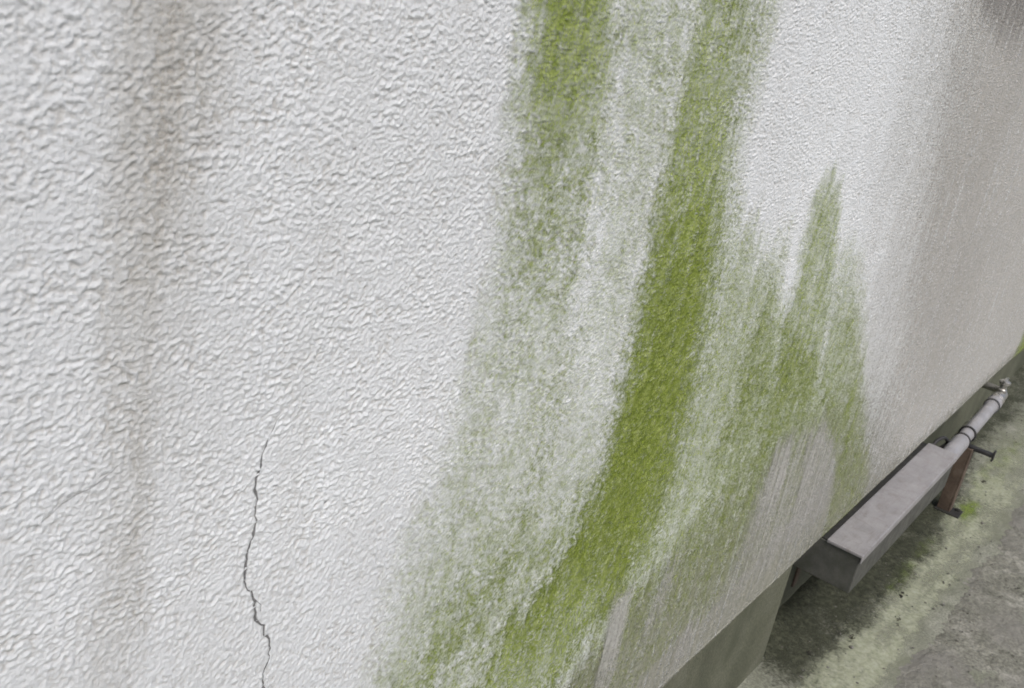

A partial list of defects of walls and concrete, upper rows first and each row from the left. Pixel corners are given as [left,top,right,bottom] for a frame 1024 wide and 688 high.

crack [244,419,278,688]
water stain [379,0,1024,688]